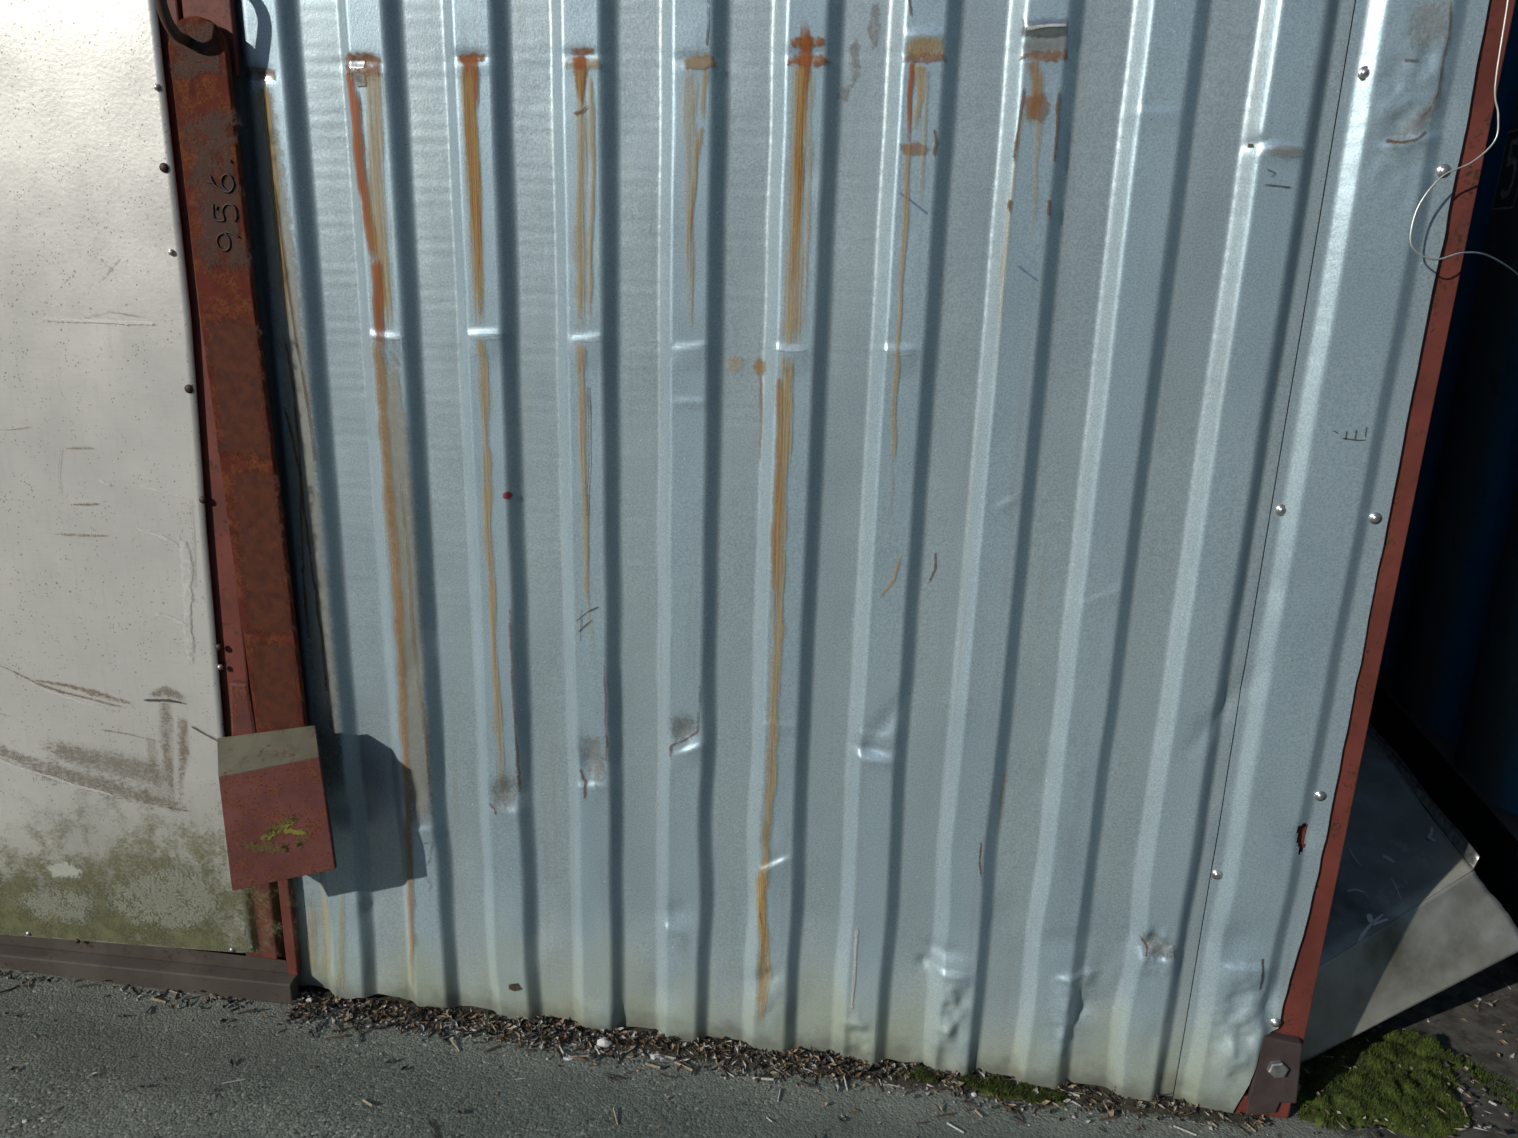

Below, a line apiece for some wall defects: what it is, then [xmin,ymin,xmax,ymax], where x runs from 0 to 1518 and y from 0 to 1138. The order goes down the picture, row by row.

corrosion [459,53,484,308]
corrosion [565,48,598,313]
corrosion [690,129,702,229]
corrosion [684,0,717,111]
corrosion [786,29,828,338]
corrosion [892,37,945,453]
corrosion [1013,49,1068,162]
corrosion [345,52,433,964]
corrosion [478,341,521,792]
corrosion [577,348,590,591]
corrosion [753,359,792,957]